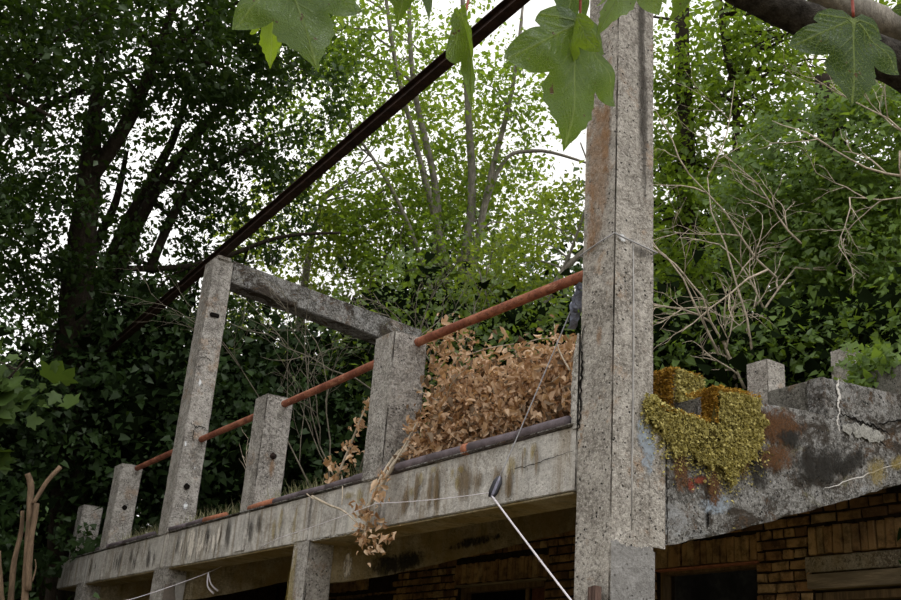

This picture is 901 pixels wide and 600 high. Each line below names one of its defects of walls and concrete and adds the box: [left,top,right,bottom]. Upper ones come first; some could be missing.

damp [749,447,767,488]
damp [778,429,865,484]
crack [825,379,901,488]
damp [175,520,231,559]